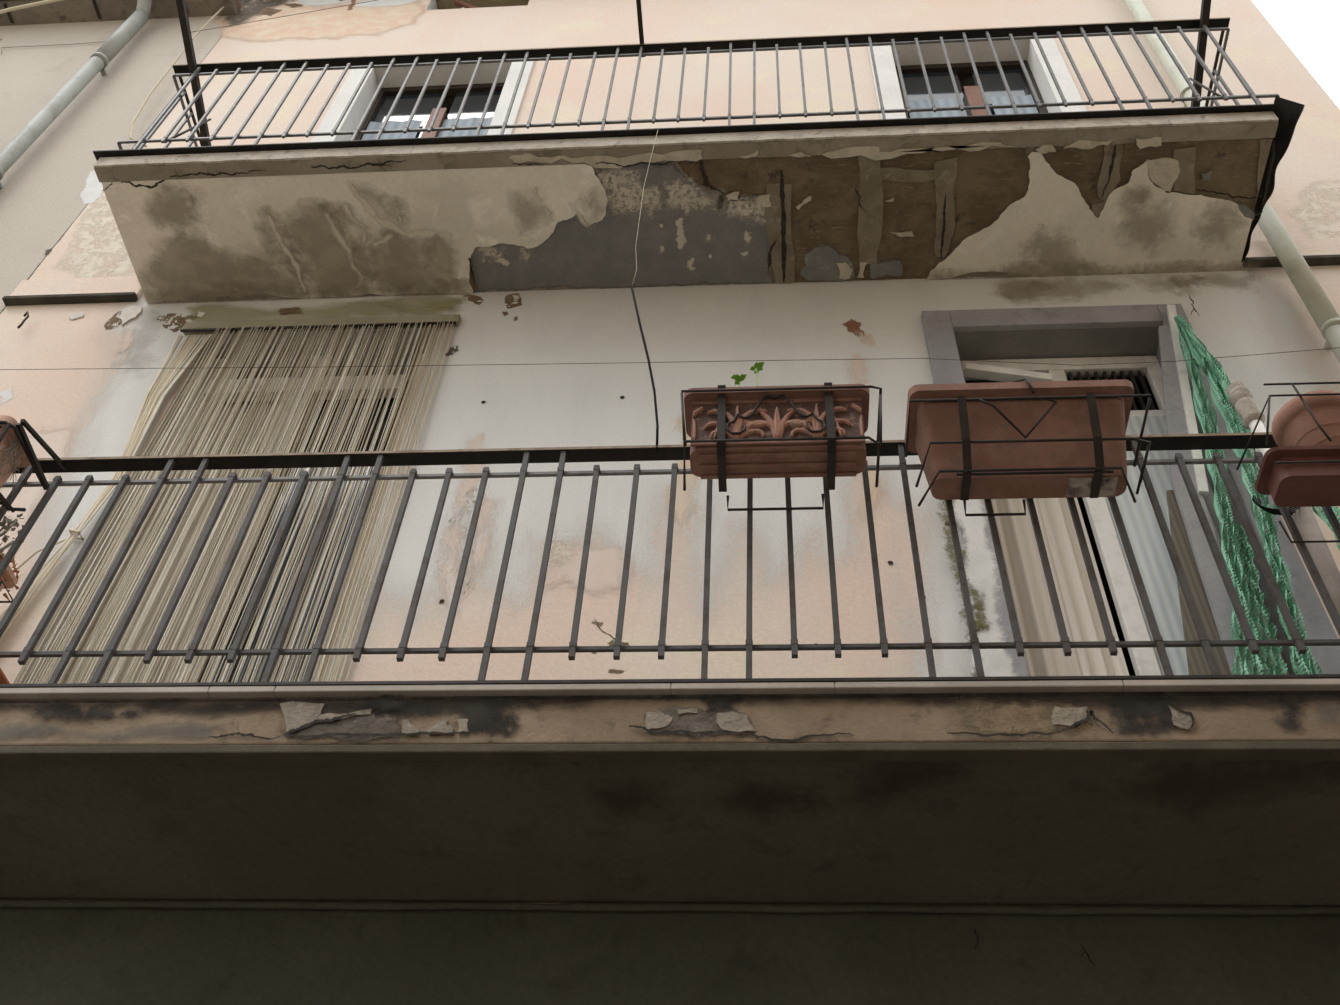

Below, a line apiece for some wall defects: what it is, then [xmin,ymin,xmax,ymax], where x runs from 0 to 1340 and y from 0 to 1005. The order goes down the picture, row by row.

crack [102,170,266,191]
crack [312,160,406,170]
leakage [147,186,461,322]
rust [844,319,875,385]
peeling [0,137,1340,681]
spalling [280,701,469,743]
spalling [645,706,755,739]
spalling [962,702,1089,740]
spalling [1168,706,1194,731]